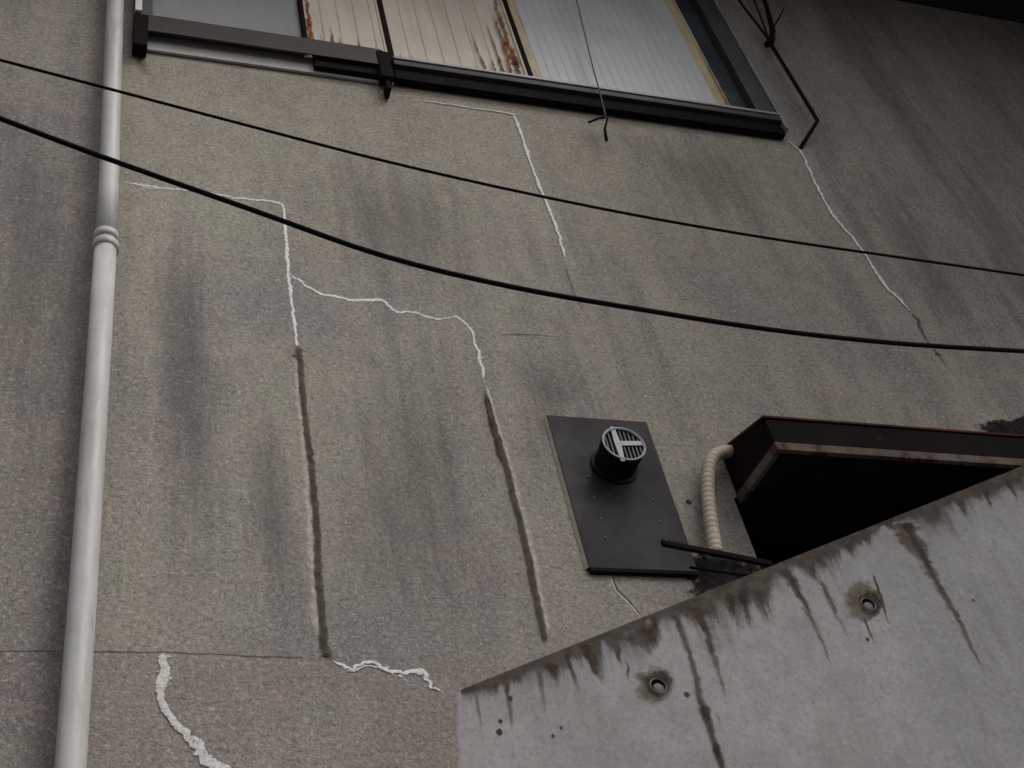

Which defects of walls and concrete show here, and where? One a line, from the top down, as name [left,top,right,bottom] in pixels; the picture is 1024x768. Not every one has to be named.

crack [126,182,502,437]
crack [400,98,576,296]
crack [788,140,943,361]
crack [94,650,293,658]
crack [333,660,442,692]
leakage [461,525,875,768]
leakage [846,576,886,637]
leakage [892,466,1023,656]